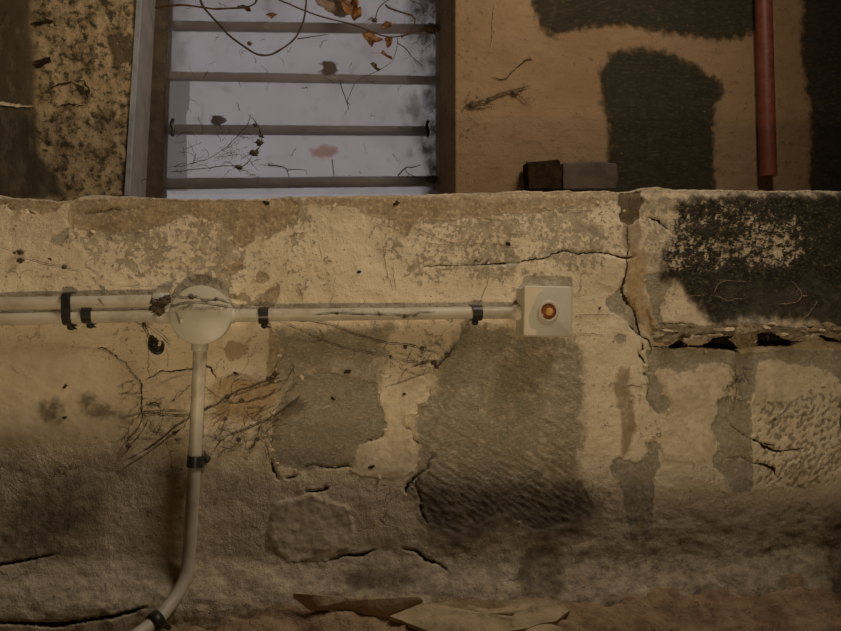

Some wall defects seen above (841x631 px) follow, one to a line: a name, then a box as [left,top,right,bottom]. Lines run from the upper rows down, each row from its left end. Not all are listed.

peeling [266,323,394,472]
peeling [409,324,591,532]
crack [376,223,810,410]
peeling [610,368,661,543]
peeling [643,272,841,495]
crack [727,420,802,474]
crack [0,607,144,628]